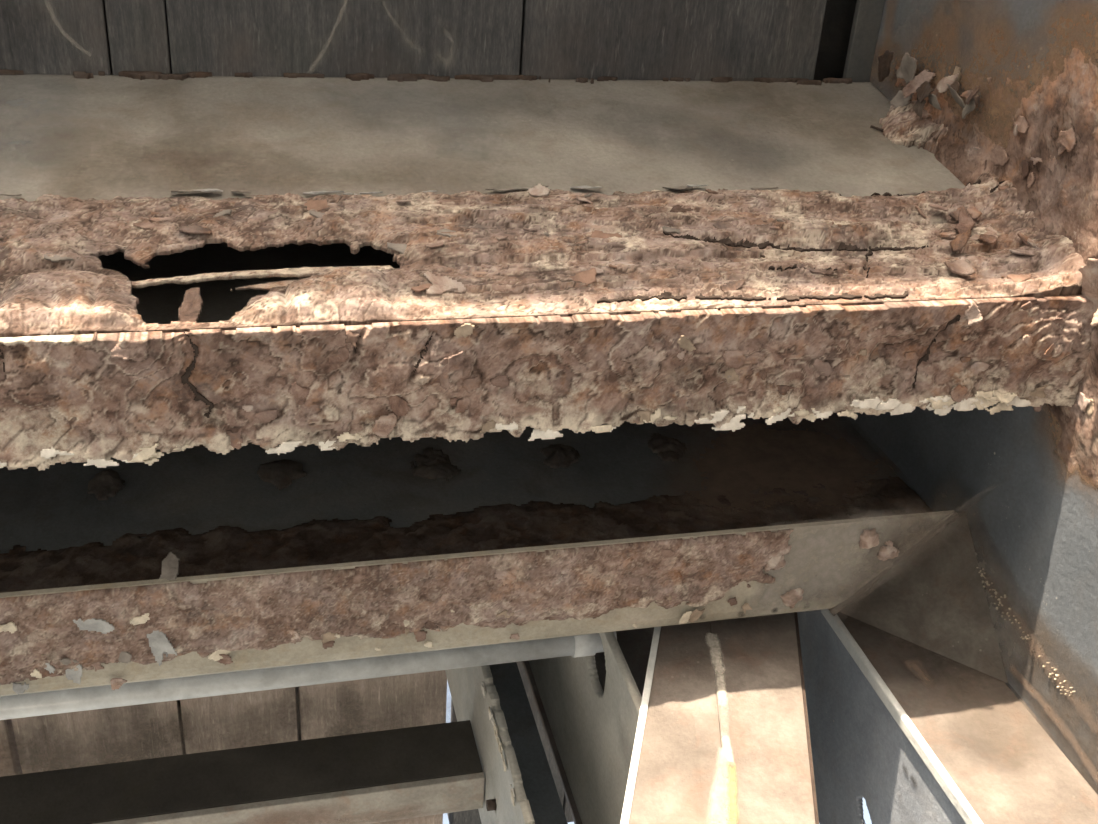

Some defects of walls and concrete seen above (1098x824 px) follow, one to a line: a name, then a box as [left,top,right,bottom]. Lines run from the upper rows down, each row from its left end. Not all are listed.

peeling [178,287,203,323]
peeling [231,277,310,292]
rust [0,2,1098,593]
peeling [73,618,114,634]
peeling [147,630,177,666]
rust [0,529,794,695]
rust [707,633,726,716]
rust [723,737,737,824]